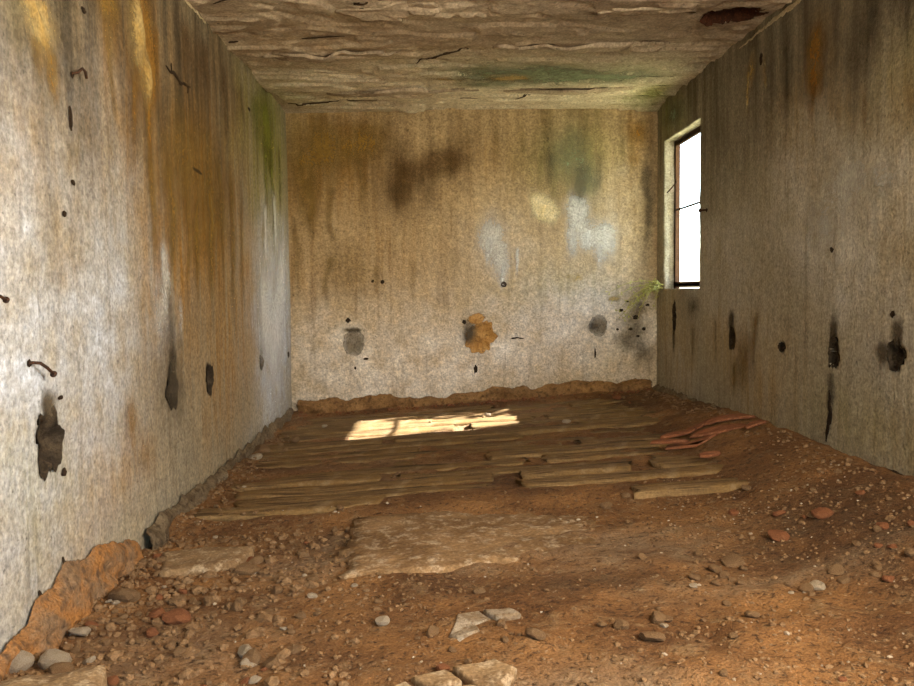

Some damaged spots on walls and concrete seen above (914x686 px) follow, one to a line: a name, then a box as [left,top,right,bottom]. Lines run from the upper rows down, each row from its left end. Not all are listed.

crack [302,33,345,41]
crack [416,47,469,64]
spalling [597,0,801,49]
crack [288,99,376,107]
water stain [159,115,243,321]
spalling [343,318,368,360]
spalling [462,313,498,354]
spalling [589,315,646,337]
spalling [876,311,906,372]
spalling [165,352,179,410]
crack [824,391,832,442]
spalling [0,378,717,681]